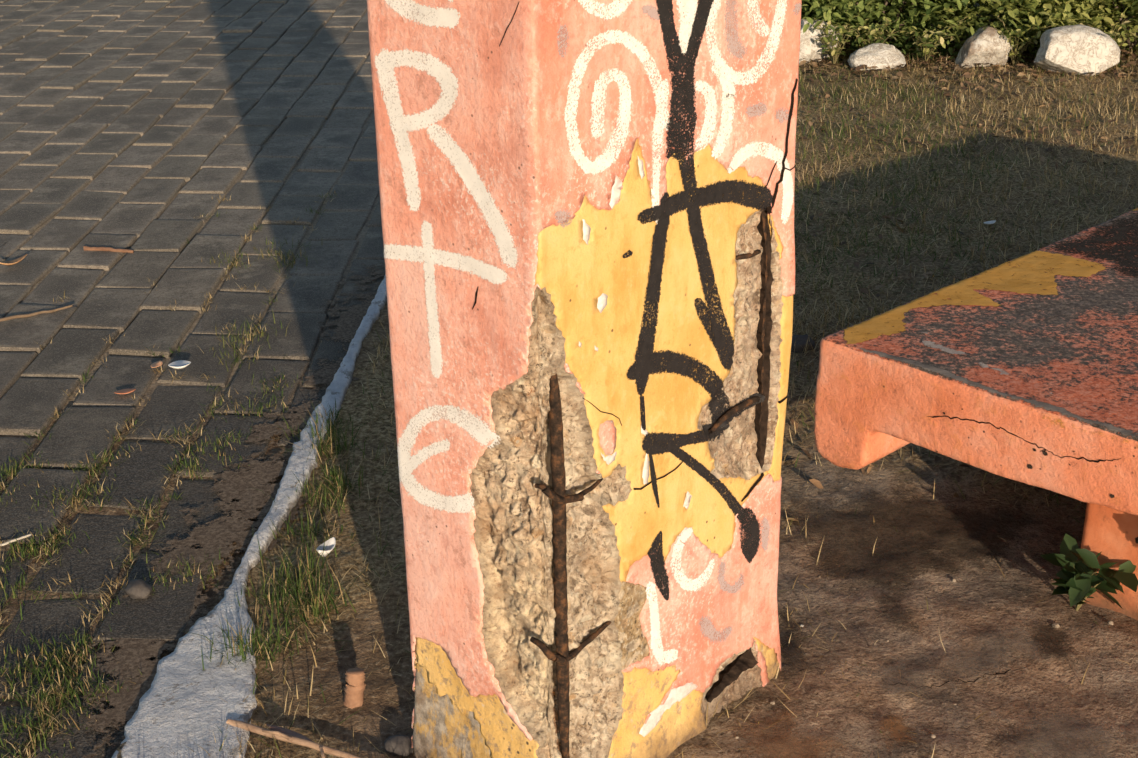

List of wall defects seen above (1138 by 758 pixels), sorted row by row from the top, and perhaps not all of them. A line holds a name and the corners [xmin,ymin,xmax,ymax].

crack [764,79,798,215]
peeling [412,138,793,758]
crack [928,416,1121,463]
rust [552,689,563,758]